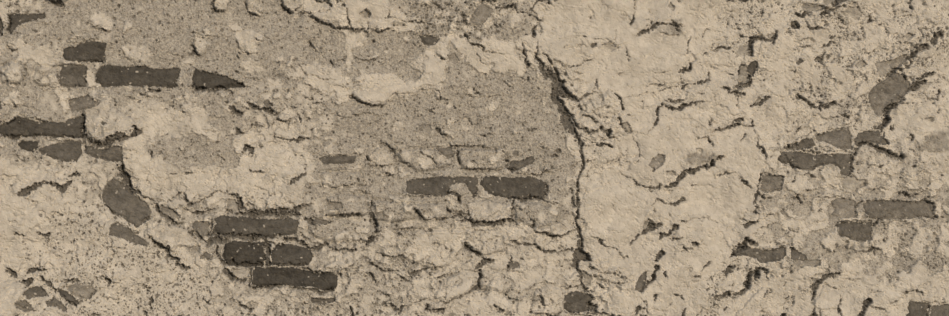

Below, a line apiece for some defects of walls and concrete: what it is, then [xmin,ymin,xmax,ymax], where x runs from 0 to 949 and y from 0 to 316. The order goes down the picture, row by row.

crack [210,0,226,14]
crack [451,148,463,165]
crack [501,150,510,169]
crack [510,0,710,294]
crack [736,97,808,224]
spalling [633,23,949,316]
crack [848,154,856,173]
crack [368,199,379,234]
crack [248,241,273,285]
crack [348,298,361,316]
crack [388,272,522,316]
crack [818,296,844,316]